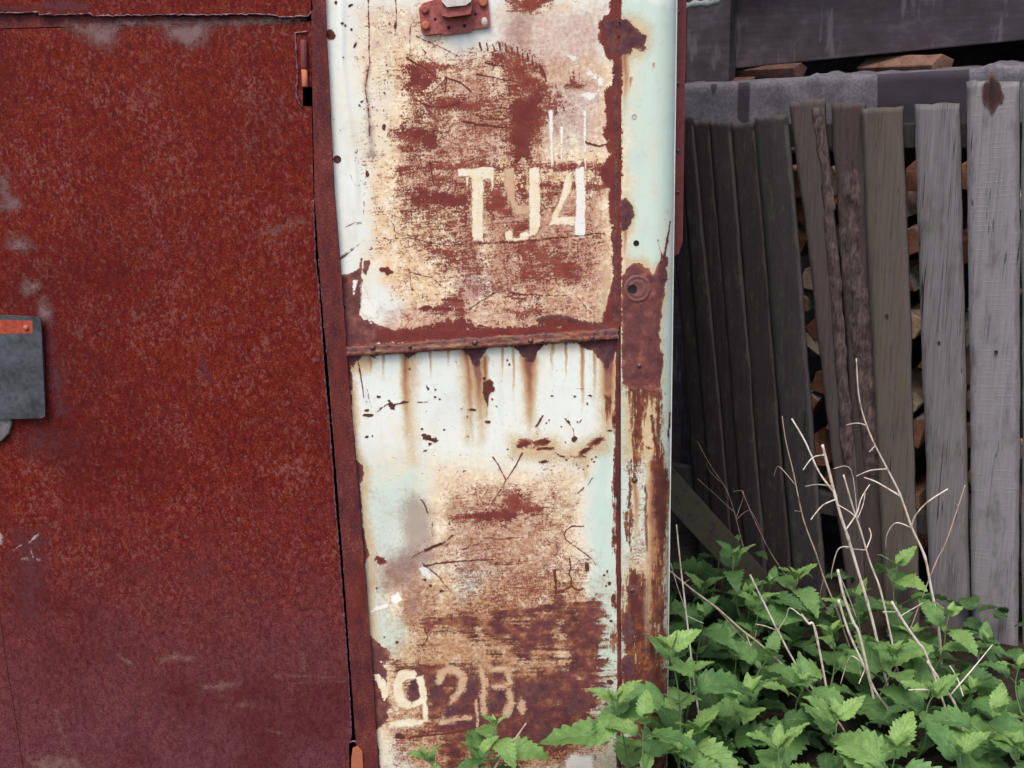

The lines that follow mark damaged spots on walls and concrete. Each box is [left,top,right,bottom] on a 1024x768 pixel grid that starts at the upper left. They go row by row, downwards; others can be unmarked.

peeling [342,258,396,346]
spalling [482,377,495,415]
rust [348,0,671,768]
peeling [514,436,606,475]
peeling [370,592,402,613]